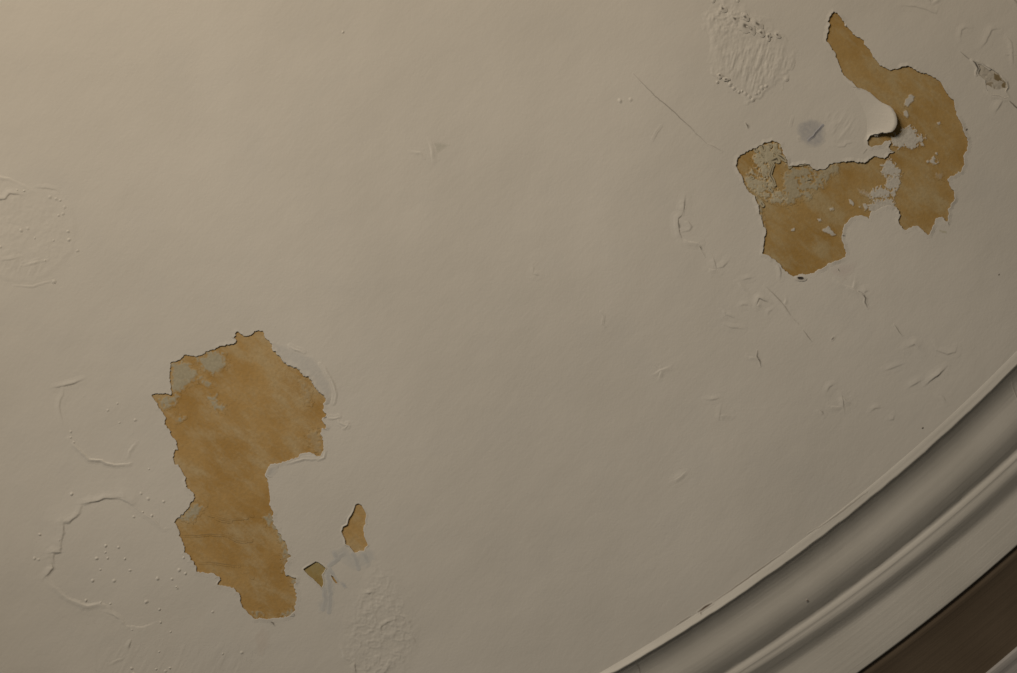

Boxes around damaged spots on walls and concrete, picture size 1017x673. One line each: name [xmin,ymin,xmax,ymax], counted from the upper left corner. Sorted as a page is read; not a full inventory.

peeling [732,8,972,281]
peeling [148,326,351,623]
peeling [339,502,370,555]